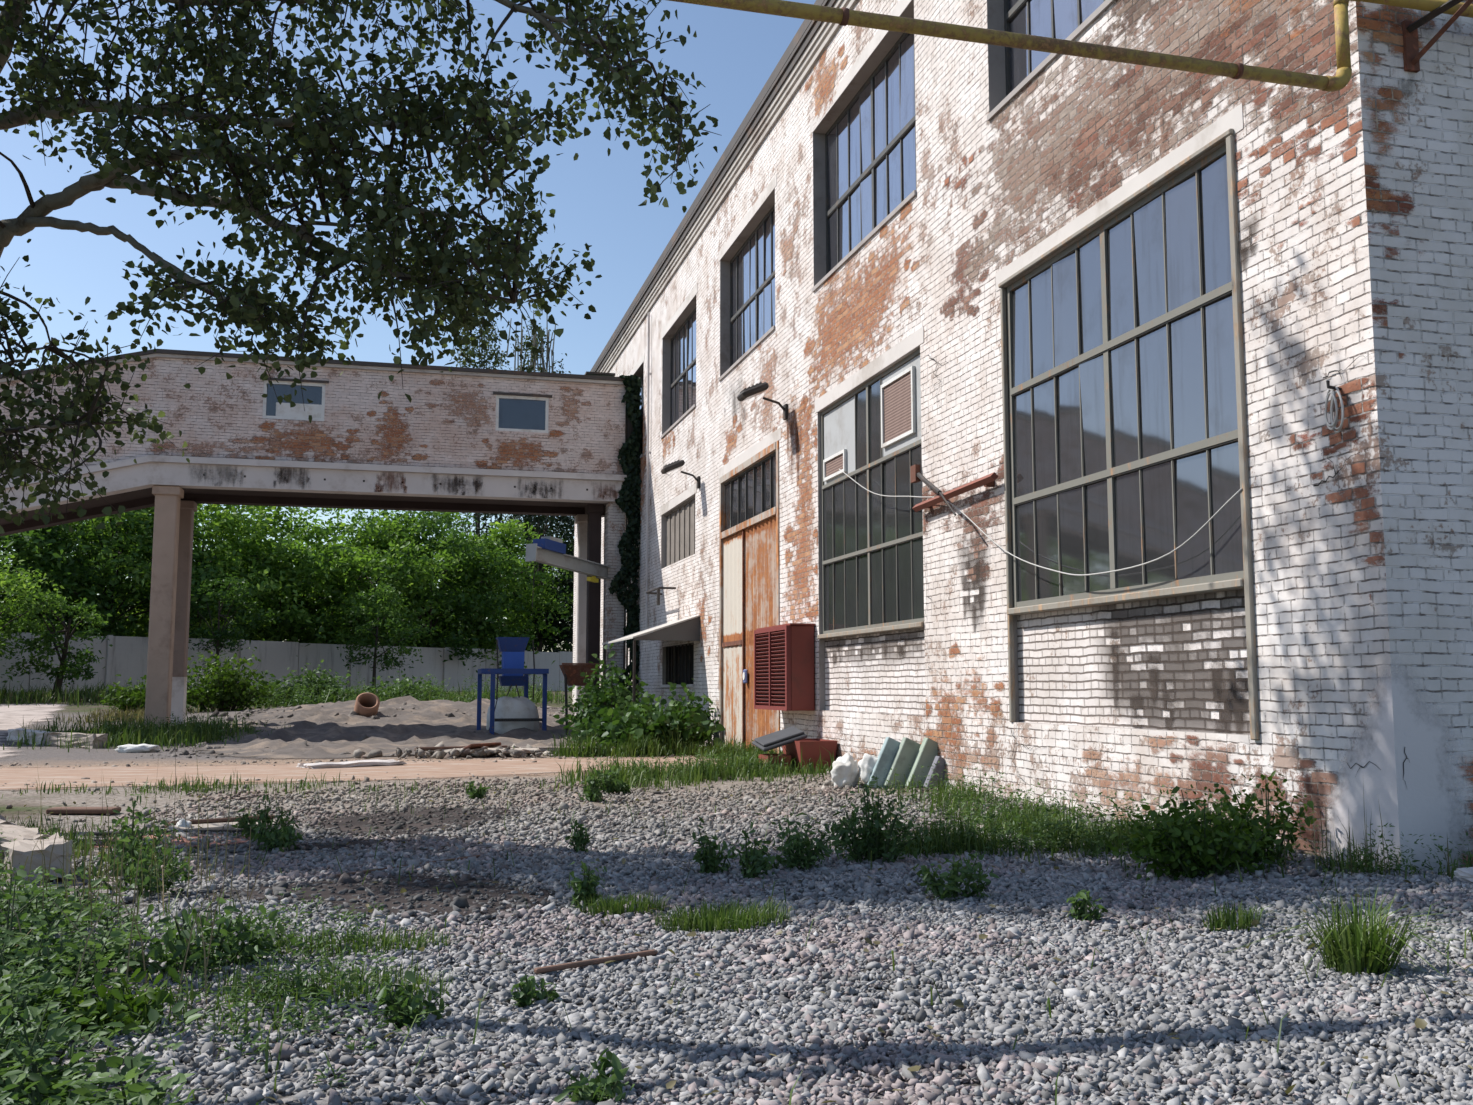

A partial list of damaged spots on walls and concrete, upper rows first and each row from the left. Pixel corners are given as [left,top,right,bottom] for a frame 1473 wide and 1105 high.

peeling [940,0,1435,321]
peeling [1372,299,1405,361]
leakage [274,468,309,487]
peeling [146,379,591,469]
leakage [434,474,482,495]
peeling [722,202,919,624]
leakage [960,542,985,633]
peeling [920,642,1004,780]
leakage [1102,590,1250,734]
peeling [1083,735,1337,856]